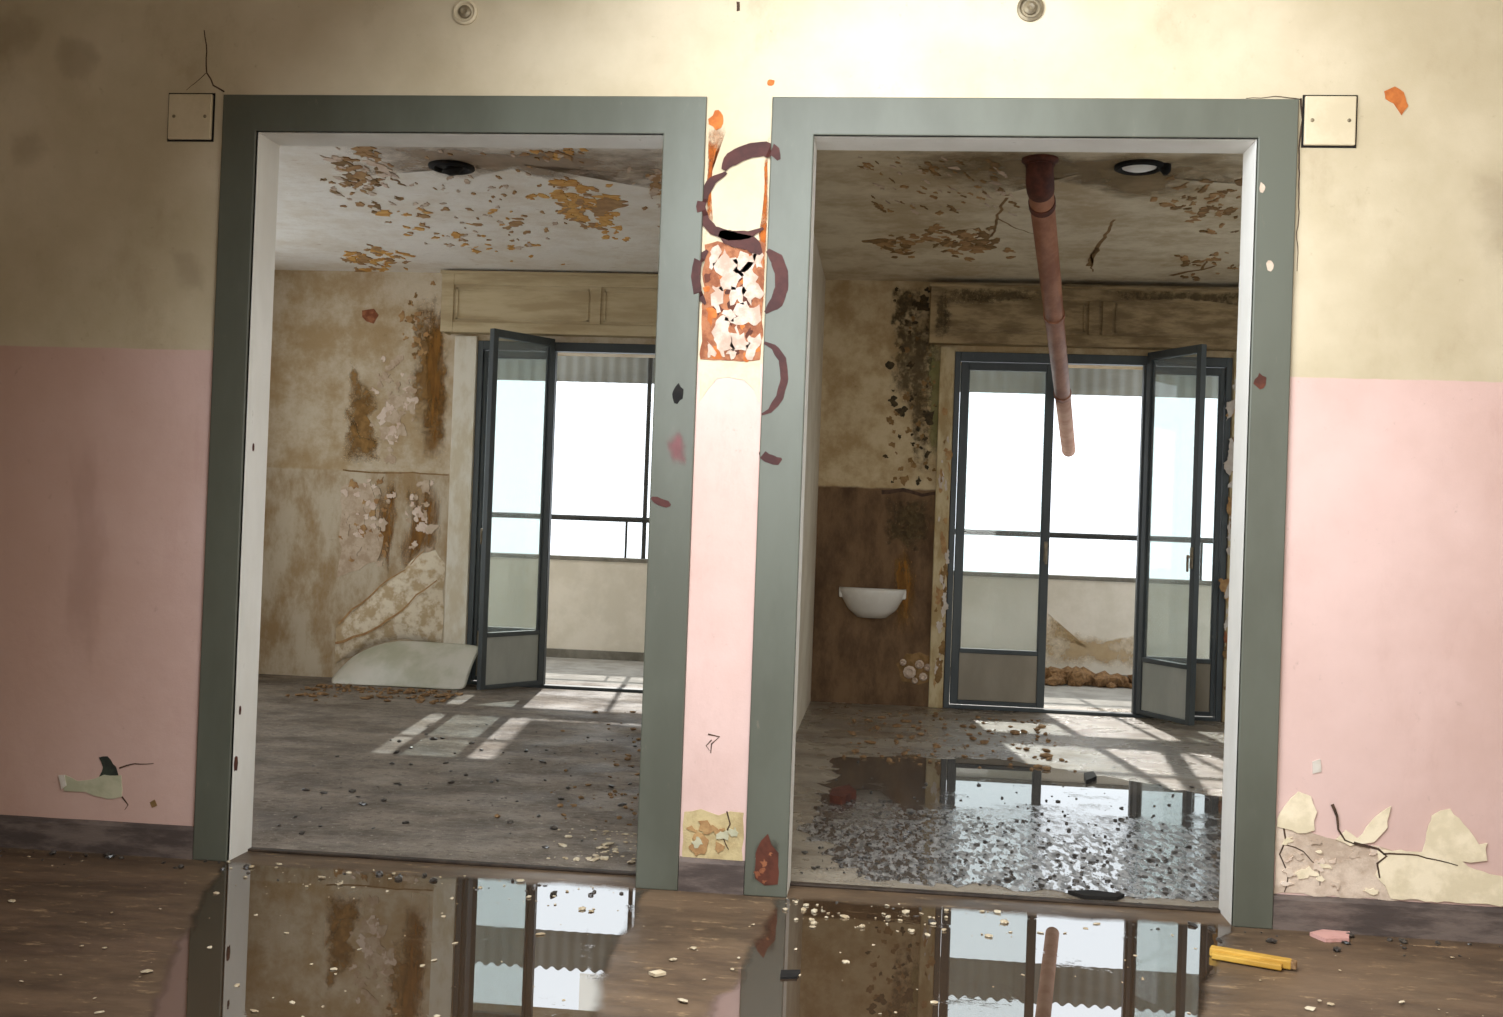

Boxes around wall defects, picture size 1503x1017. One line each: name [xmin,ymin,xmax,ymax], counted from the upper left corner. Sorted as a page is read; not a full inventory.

spalling [1384,86,1408,115]
peeling [320,146,662,272]
peeling [858,156,1020,262]
peeling [1150,175,1265,281]
peeling [699,241,766,402]
water stain [1118,291,1239,305]
peeling [337,281,439,578]
spalling [682,809,744,861]
corrosion [754,834,779,885]
crack [1279,828,1320,892]
peeling [1274,792,1503,906]
crack [1331,804,1458,878]